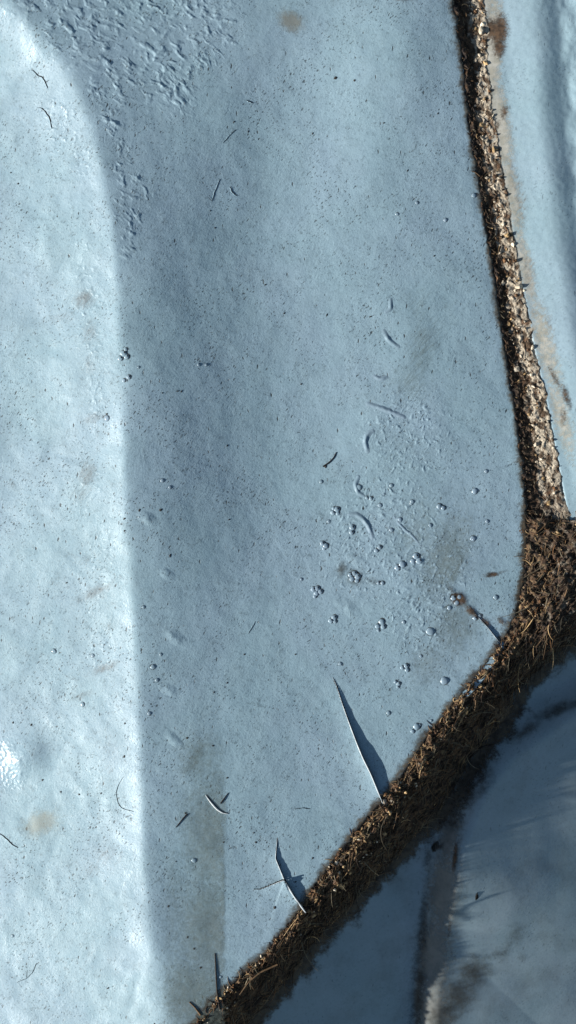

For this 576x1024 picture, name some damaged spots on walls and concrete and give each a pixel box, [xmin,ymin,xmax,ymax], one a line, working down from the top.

corrosion [482,15,508,57]